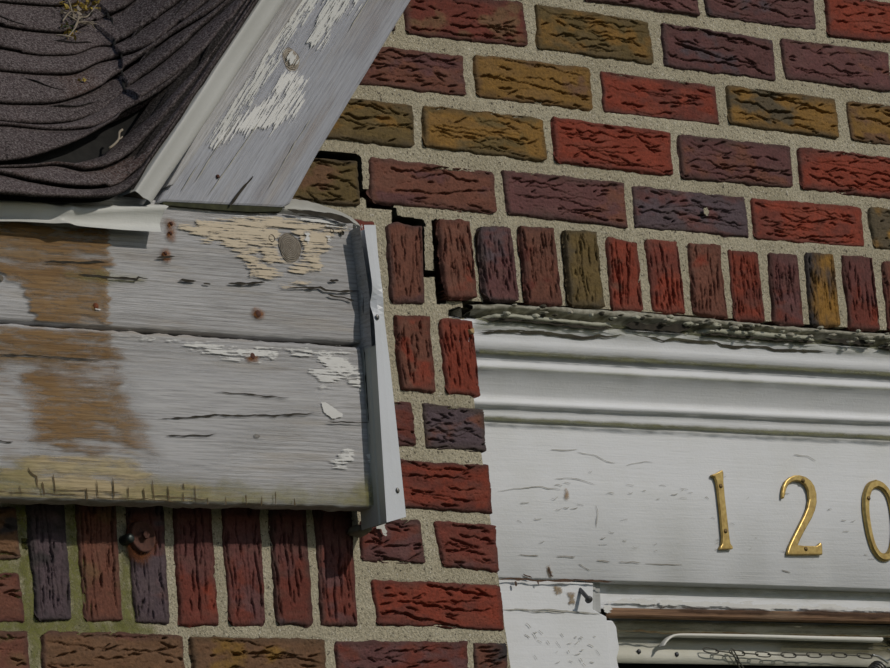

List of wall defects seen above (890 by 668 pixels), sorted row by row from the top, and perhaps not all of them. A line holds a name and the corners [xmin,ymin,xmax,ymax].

peeling [207,0,364,150]
crack [45,260,148,281]
peeling [178,215,363,289]
crack [160,119,890,353]
peeling [0,383,34,465]
damp [0,221,232,668]
peeling [112,329,364,469]